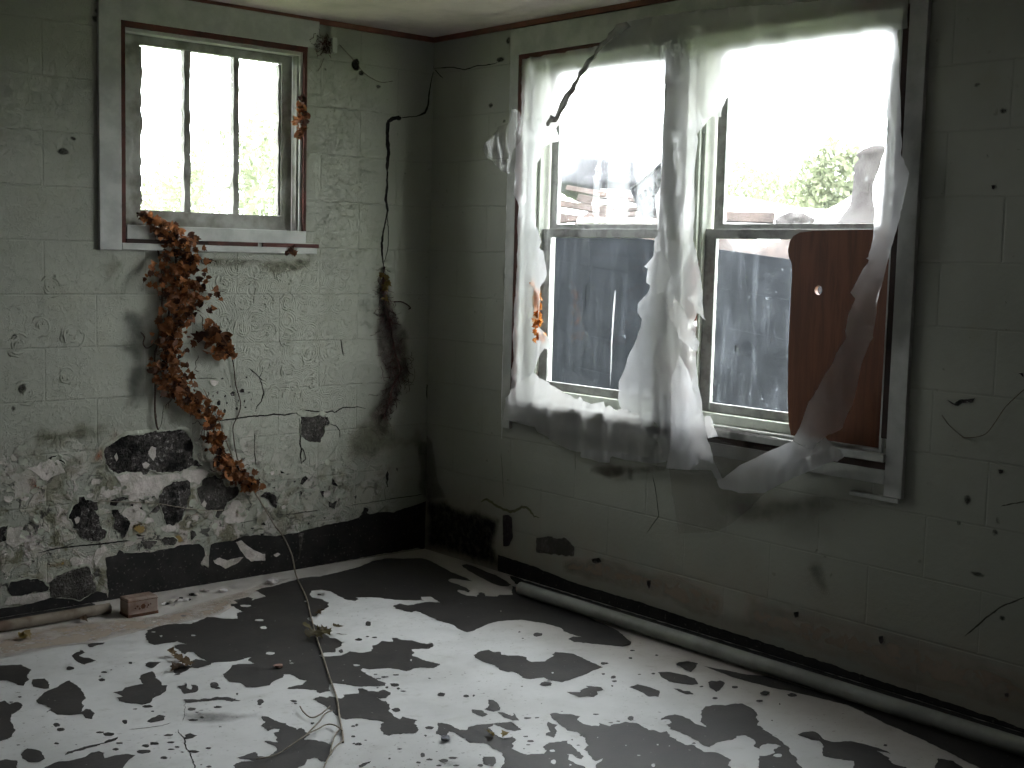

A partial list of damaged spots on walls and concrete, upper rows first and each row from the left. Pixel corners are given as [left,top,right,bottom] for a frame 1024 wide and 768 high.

crack [217,368,366,465]
spalling [299,414,330,444]
spalling [0,426,308,605]
peeling [319,459,369,519]
spalling [535,536,575,557]
crack [965,598,1023,636]
peeling [0,558,1024,768]